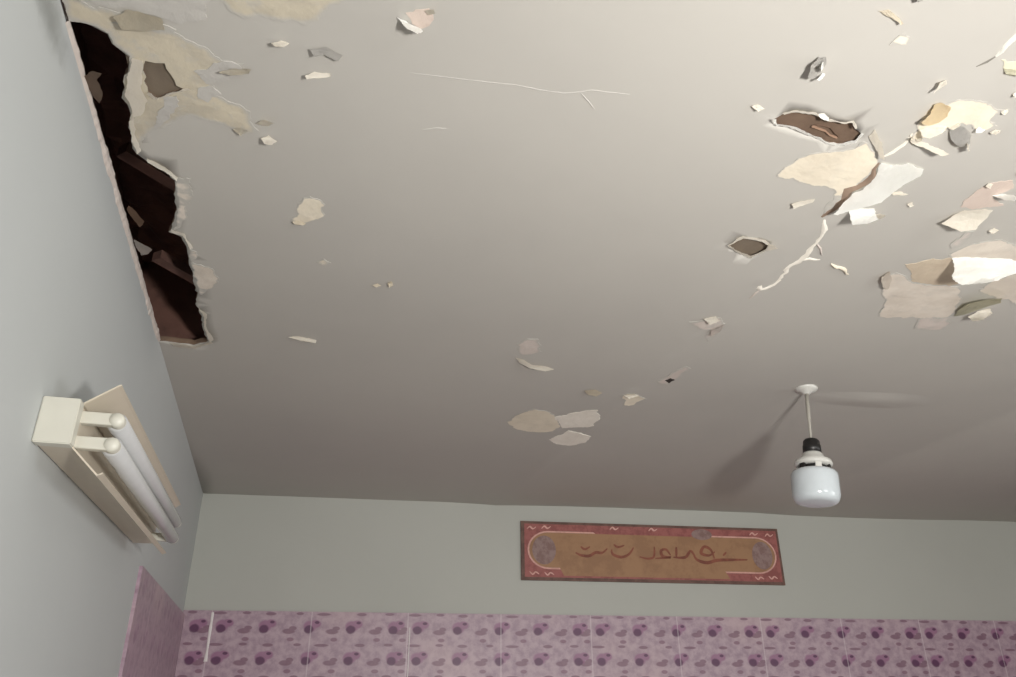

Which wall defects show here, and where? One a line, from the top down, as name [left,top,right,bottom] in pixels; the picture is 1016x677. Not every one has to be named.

crack [976,34,1016,67]
peeling [62,0,344,349]
crack [749,133,913,299]
peeling [777,130,924,225]
peeling [878,180,1016,331]
peeling [506,409,600,446]